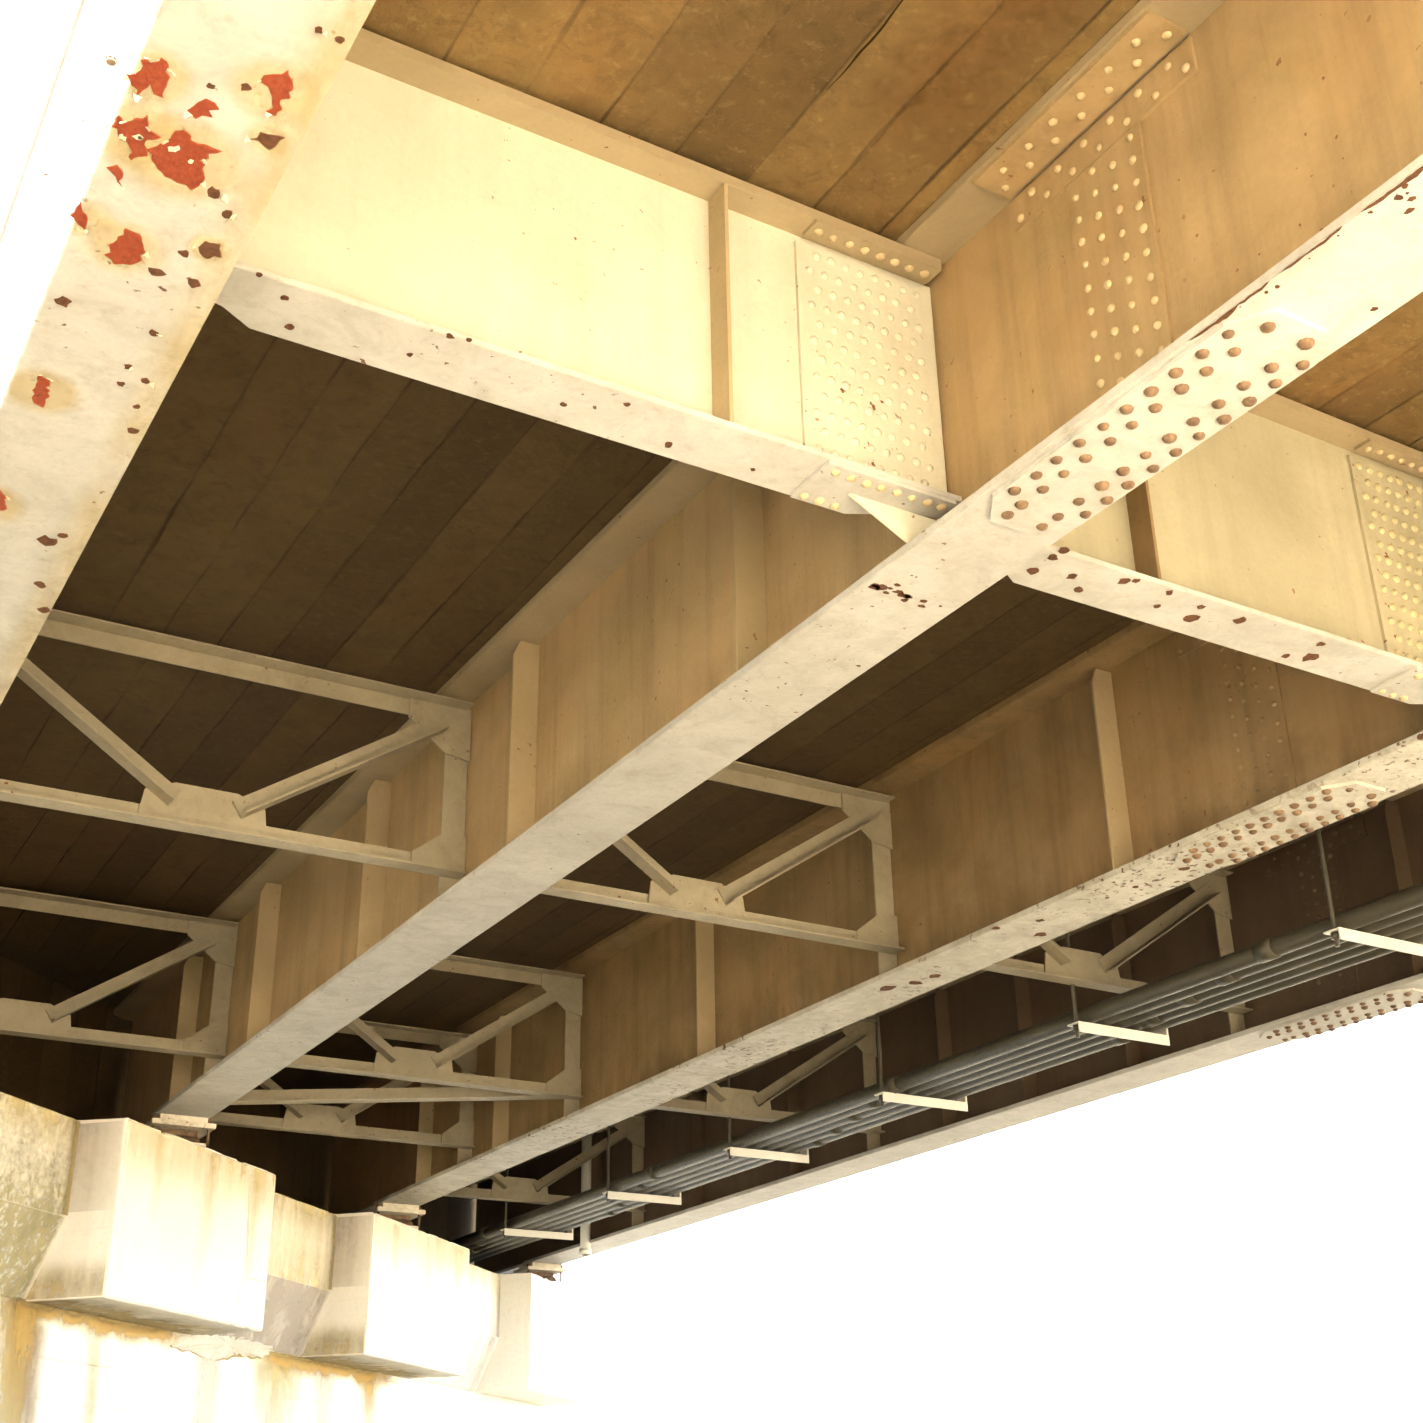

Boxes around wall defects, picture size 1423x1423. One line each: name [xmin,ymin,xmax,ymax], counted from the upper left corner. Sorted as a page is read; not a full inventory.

peeling [104,57,222,191]
peeling [244,70,294,150]
corrosion [1361,166,1423,214]
peeling [70,201,88,234]
peeling [104,228,149,265]
corrosion [1189,226,1342,341]
peeling [0,490,10,511]
corrosion [868,583,942,608]
corrosion [880,974,941,991]
water stain [11,1096,25,1110]
water stain [0,1119,425,1423]